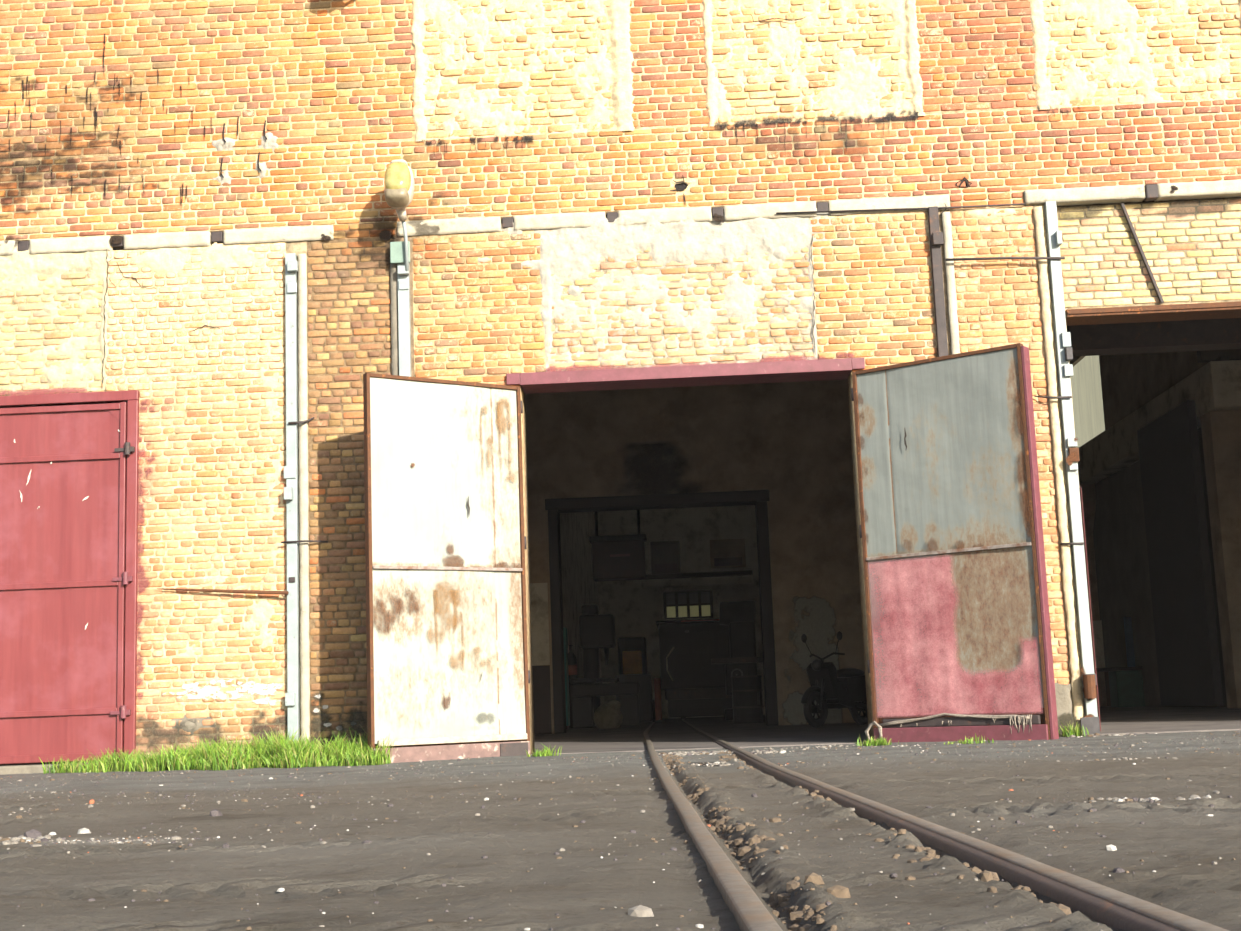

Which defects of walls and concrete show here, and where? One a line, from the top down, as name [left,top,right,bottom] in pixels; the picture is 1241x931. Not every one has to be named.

damp [8,76,32,150]
damp [45,34,142,154]
corrosion [446,545,464,567]
corrosion [374,593,420,631]